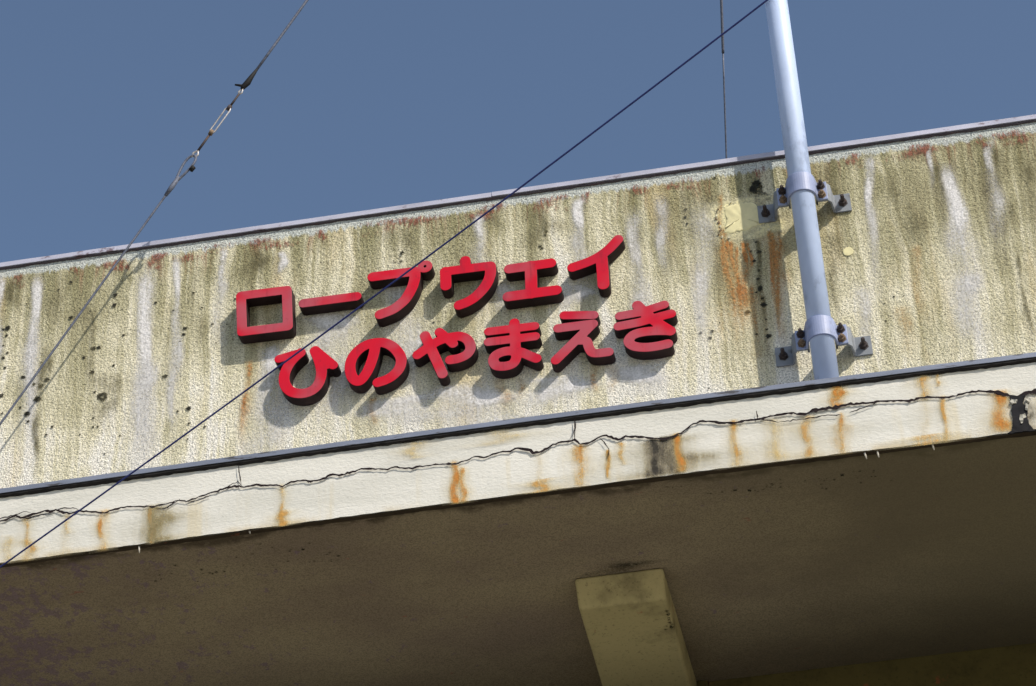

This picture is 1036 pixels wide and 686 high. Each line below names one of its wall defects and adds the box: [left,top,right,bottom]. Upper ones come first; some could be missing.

damp [927,150,968,254]
corrosion [720,230,757,328]
corrosion [767,231,784,315]
damp [0,280,73,451]
damp [122,275,194,429]
damp [311,313,355,349]
damp [364,386,518,424]
corrosion [993,391,1011,430]
corrosion [277,491,288,526]
corrosion [450,462,467,503]
crack [0,388,1036,521]
damp [646,435,714,476]